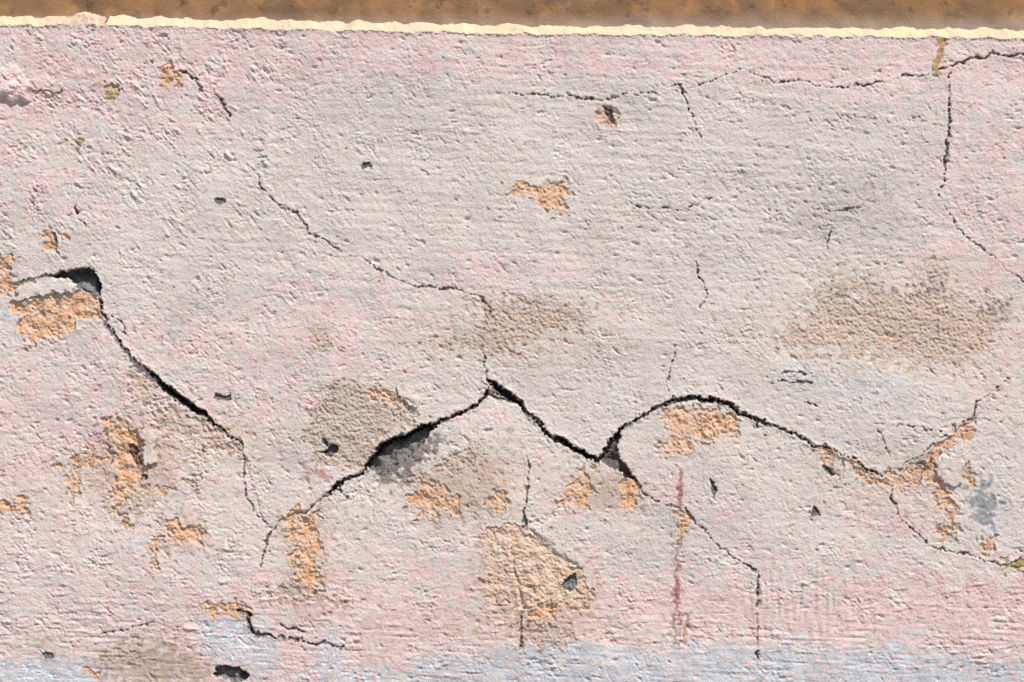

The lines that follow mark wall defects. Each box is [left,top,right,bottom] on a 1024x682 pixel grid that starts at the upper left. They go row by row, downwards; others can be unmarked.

crack [176,70,231,117]
crack [508,50,1024,256]
spalling [0,253,103,352]
crack [258,177,491,311]
spalling [50,368,242,530]
peeling [300,376,420,469]
crack [99,299,1021,567]
spalling [812,417,980,554]
crack [236,609,344,650]
spalling [270,504,347,608]
spalling [470,487,595,653]
crack [684,507,760,660]